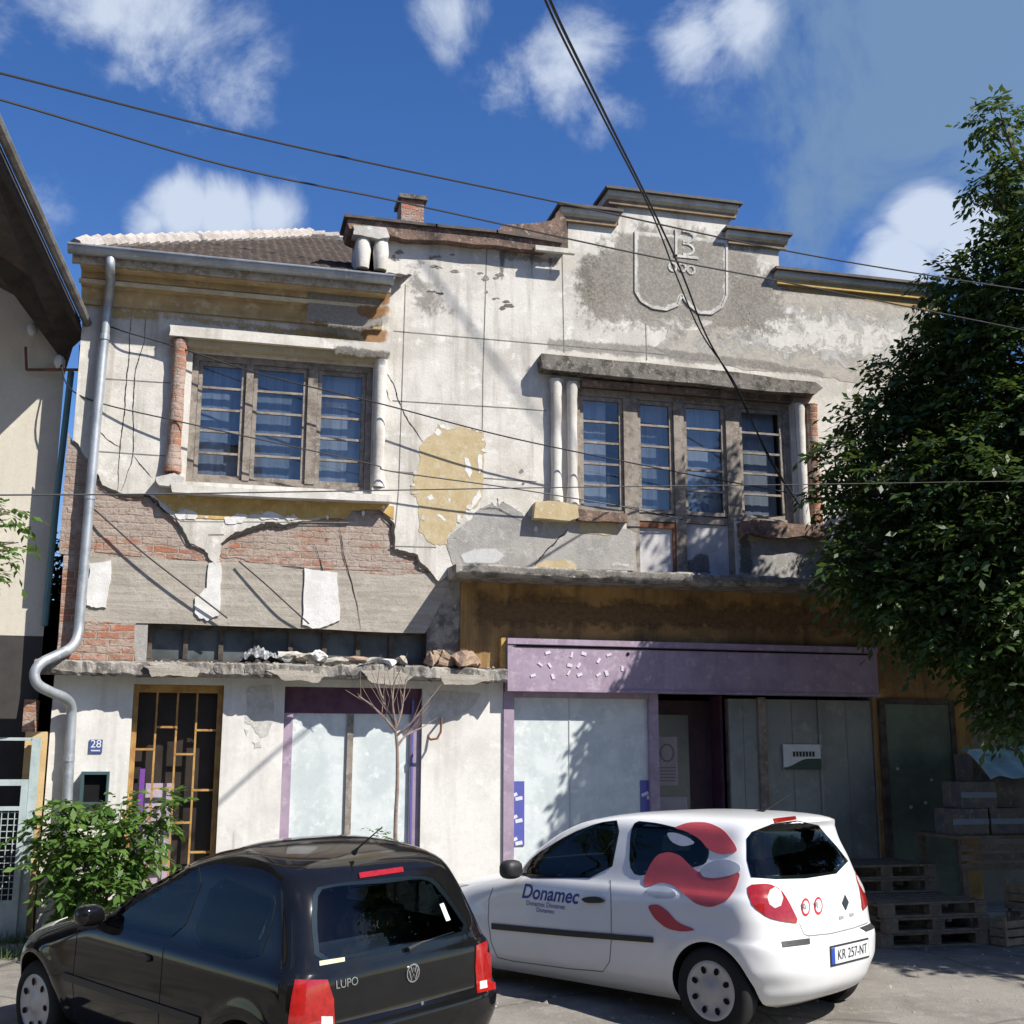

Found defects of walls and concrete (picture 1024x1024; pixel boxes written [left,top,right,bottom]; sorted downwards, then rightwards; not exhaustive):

water stain [547,226,824,377]
crack [101,320,150,491]
crack [386,374,423,441]
flaking render [57,433,491,724]
peeling [410,424,506,545]
peeling [533,559,576,569]
peeling [578,522,618,535]
water stain [477,593,884,637]